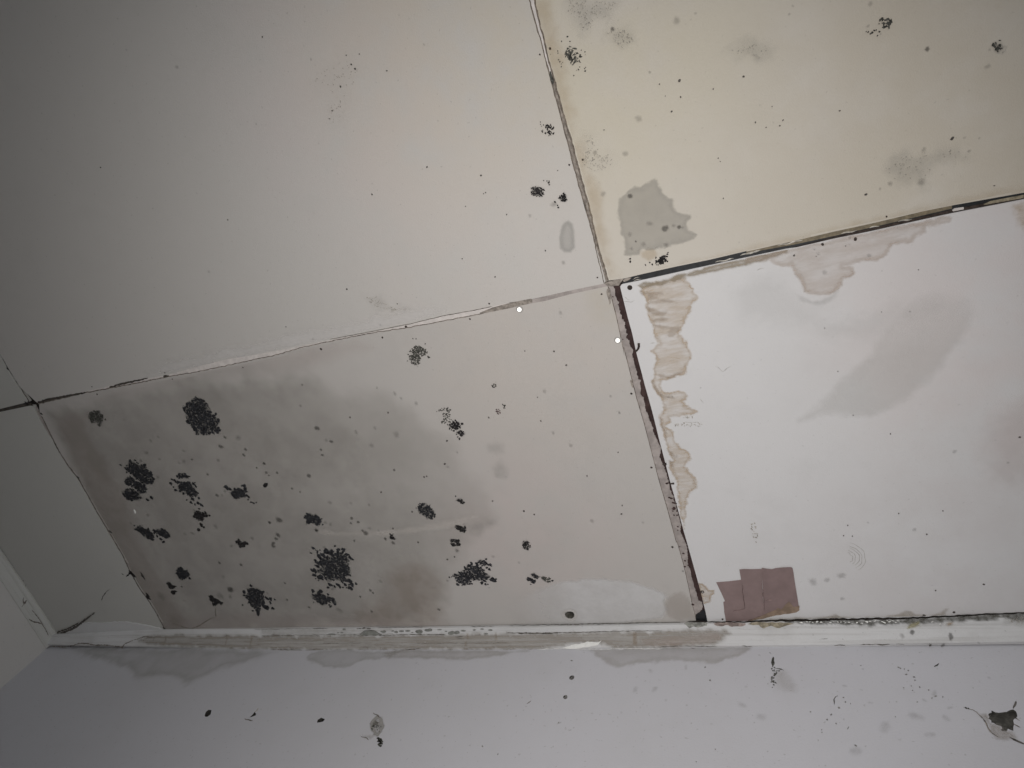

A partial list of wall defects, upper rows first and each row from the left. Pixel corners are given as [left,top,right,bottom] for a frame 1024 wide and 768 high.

damp [407,338,430,365]
damp [182,396,222,447]
damp [436,407,464,442]
damp [119,459,155,502]
damp [134,525,170,543]
damp [169,473,211,532]
damp [304,513,324,531]
damp [310,545,357,608]
damp [411,503,436,520]
damp [446,525,497,586]
damp [229,584,276,616]
spalling [964,701,1024,744]